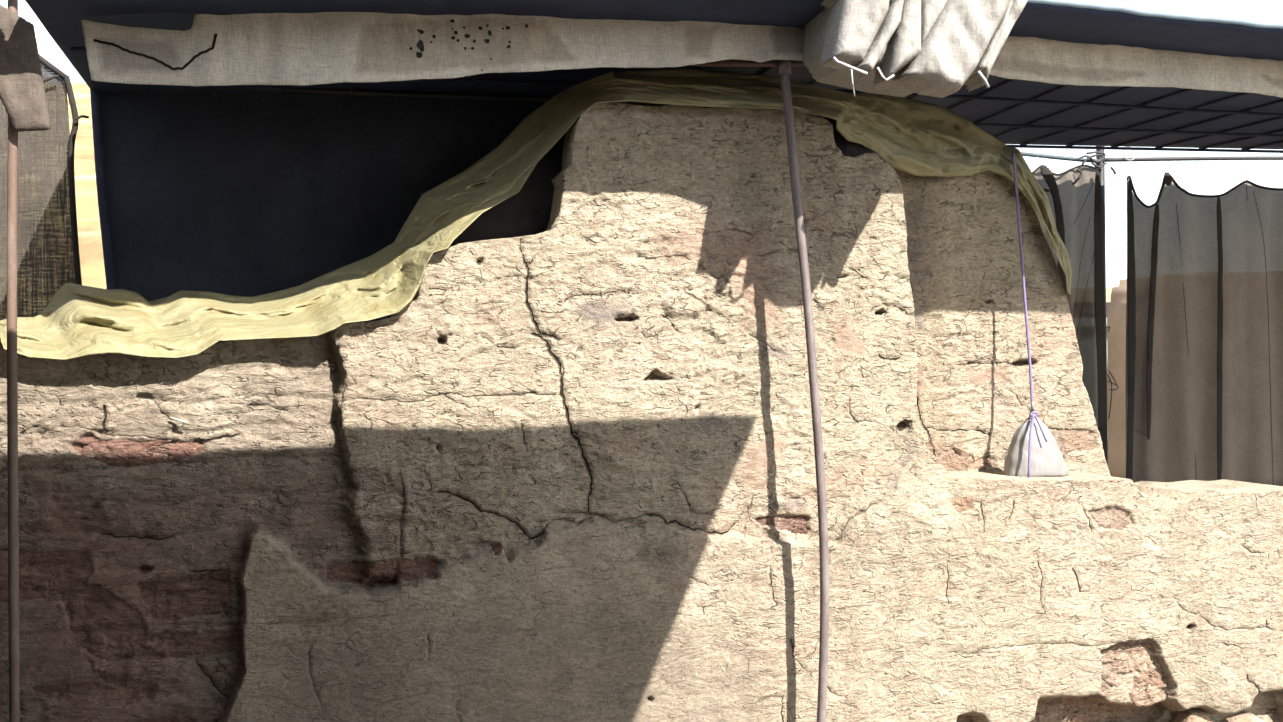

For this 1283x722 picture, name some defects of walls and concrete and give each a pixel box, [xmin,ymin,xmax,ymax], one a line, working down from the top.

spalling [72,435,206,467]
crack [338,238,737,559]
spalling [0,551,234,661]
spalling [1030,640,1169,722]